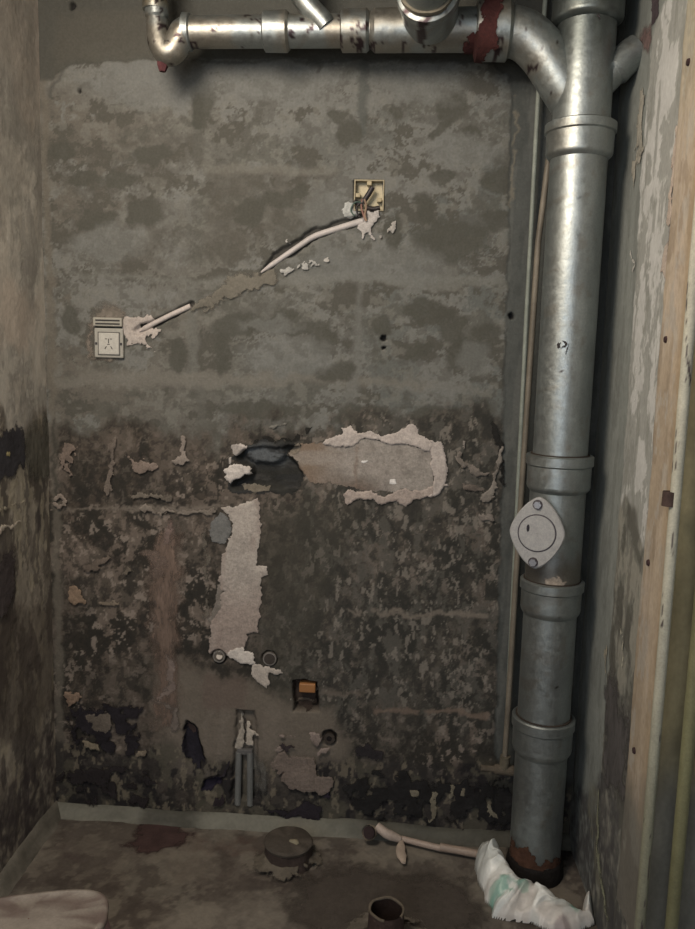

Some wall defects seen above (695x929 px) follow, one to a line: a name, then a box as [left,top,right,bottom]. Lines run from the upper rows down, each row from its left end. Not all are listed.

rust [462,0,504,64]
peeling [59,442,78,476]
peeling [104,437,117,496]
peeling [125,455,158,474]
flaking render [131,421,507,688]
spalling [290,679,318,713]
peeling [235,711,334,799]
water stain [264,801,323,821]
water stain [342,743,513,831]
rust [509,836,562,872]